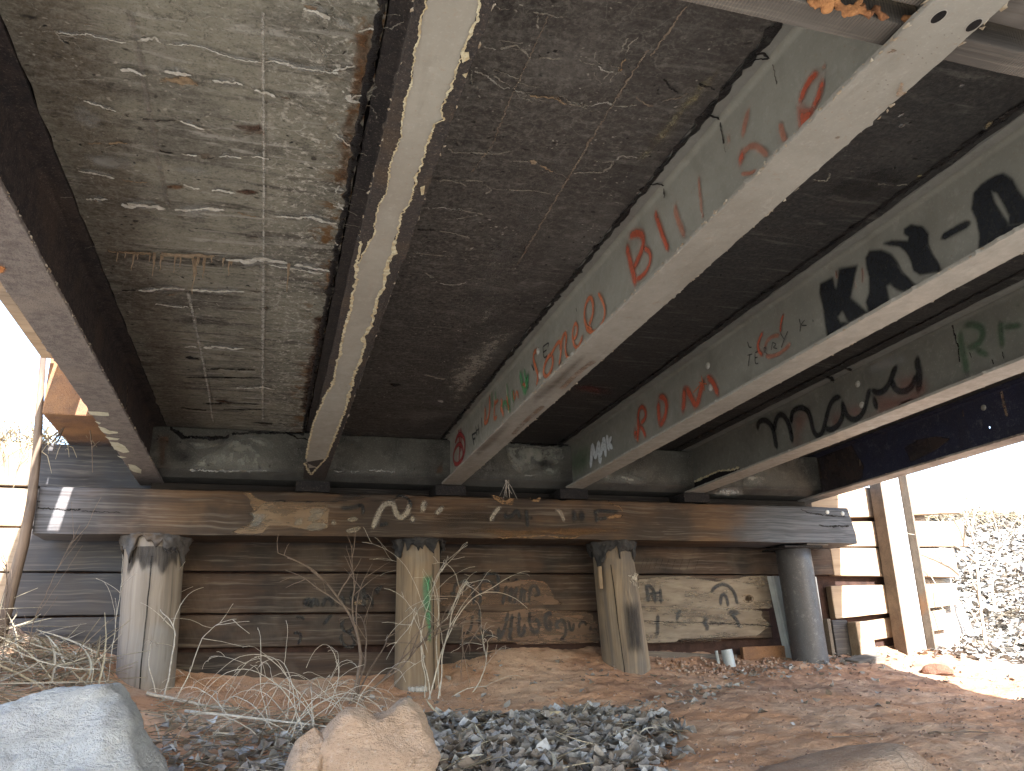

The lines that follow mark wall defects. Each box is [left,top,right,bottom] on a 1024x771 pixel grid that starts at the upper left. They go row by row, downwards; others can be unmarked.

crack [27,2,357,227]
water stain [301,35,377,119]
water stain [279,0,404,33]
crack [498,7,564,23]
crack [470,40,715,112]
peeling [170,0,496,478]
crack [412,149,650,286]
crack [139,564,152,689]